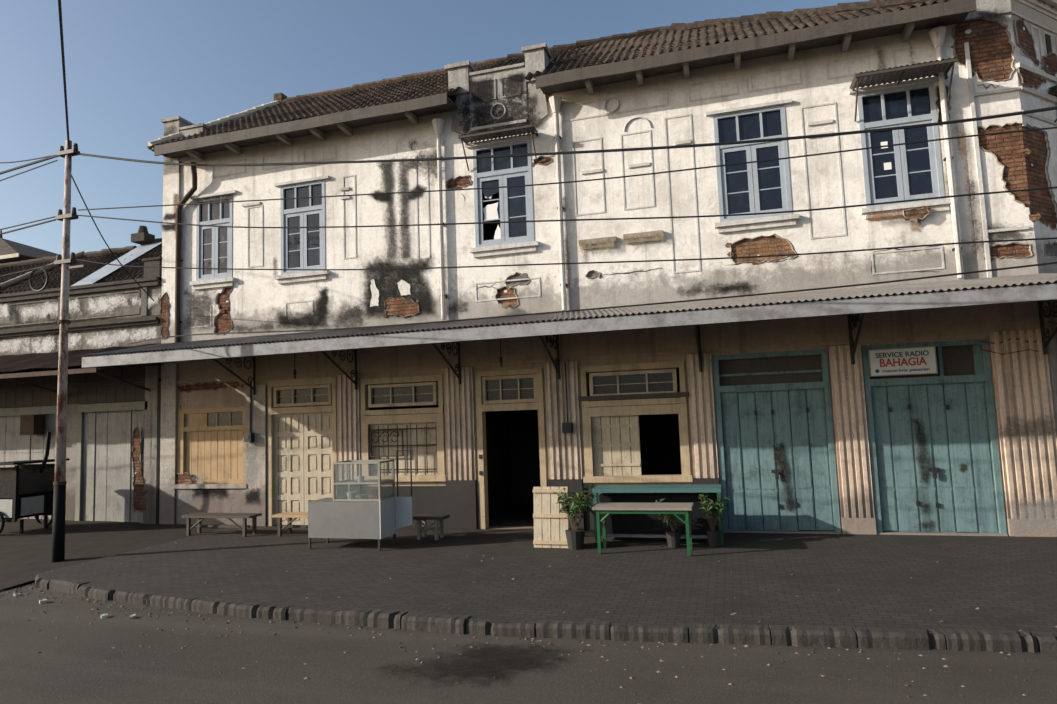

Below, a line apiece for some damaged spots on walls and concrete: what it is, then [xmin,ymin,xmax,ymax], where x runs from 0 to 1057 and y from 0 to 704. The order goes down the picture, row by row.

flaking render [951,17,1057,89]
mould [457,73,542,136]
water stain [232,141,466,332]
flaking render [445,175,473,190]
flaking render [531,156,553,167]
flaking render [725,233,797,265]
flaking render [903,206,931,230]
flaking render [977,122,1057,261]
peeling [0,292,170,353]
flaking render [214,286,234,335]
flaking render [495,272,531,309]
flaking render [131,426,148,513]